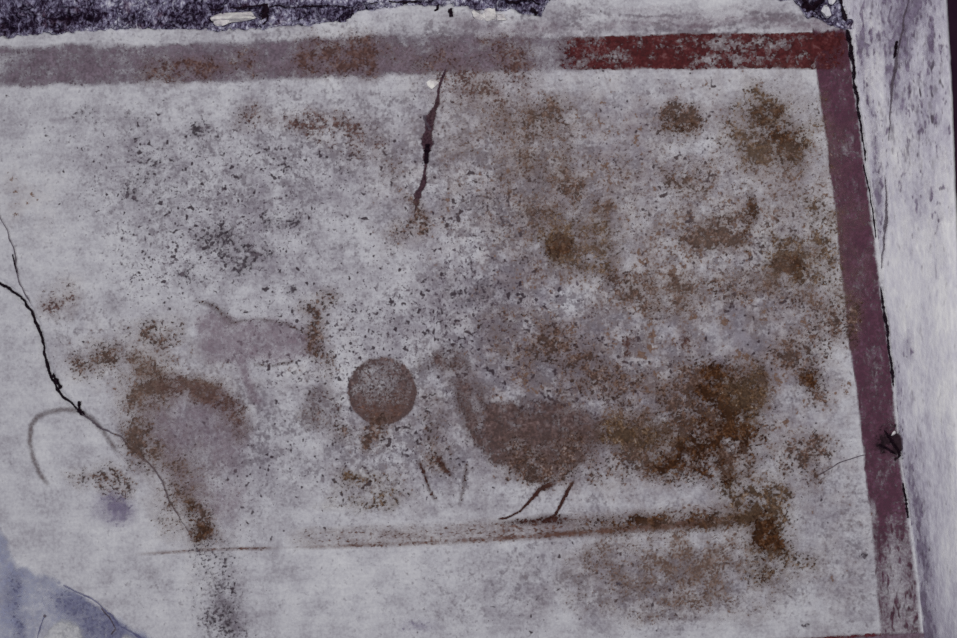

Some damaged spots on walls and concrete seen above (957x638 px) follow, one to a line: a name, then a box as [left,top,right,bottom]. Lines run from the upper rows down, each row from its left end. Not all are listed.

spalling [0,0,550,39]
spalling [779,0,853,30]
leakage [440,79,863,327]
crack [0,216,191,535]
leakage [565,515,788,625]